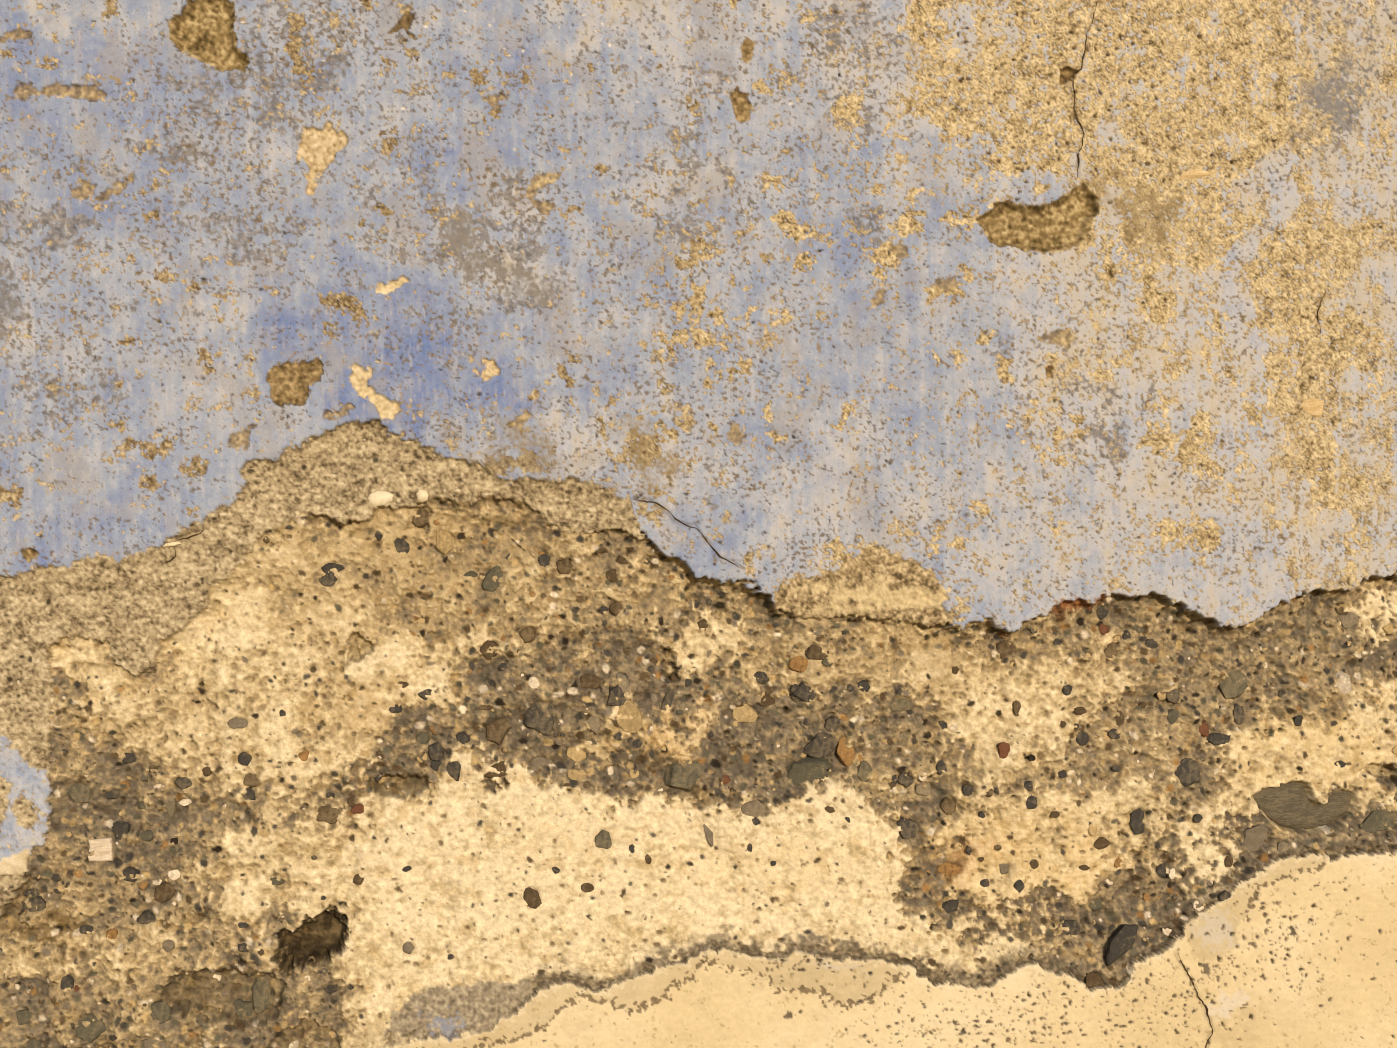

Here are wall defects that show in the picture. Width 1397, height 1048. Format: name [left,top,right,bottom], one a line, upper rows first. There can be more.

flaking render [168,0,251,72]
crack [1072,4,1097,176]
flaking render [297,121,350,196]
peeling [917,0,1331,268]
flaking render [229,422,261,453]
flaking render [266,357,324,408]
flaking render [321,363,402,421]
flaking render [507,408,531,435]
flaking render [728,423,748,446]
crack [635,495,742,569]
spalling [0,496,1397,1048]
crack [1178,953,1213,1048]